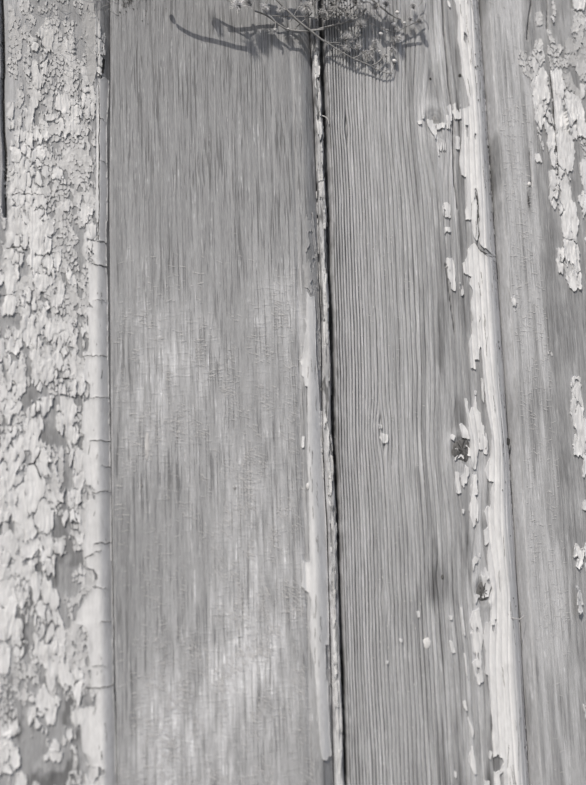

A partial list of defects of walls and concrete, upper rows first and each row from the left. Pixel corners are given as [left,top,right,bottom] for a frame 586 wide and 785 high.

crack [476,195,494,257]
peeling [518,0,586,292]
peeling [0,0,117,785]
peeling [299,51,342,785]
peeling [417,0,529,785]
peeling [570,376,586,478]
peeling [573,543,586,569]